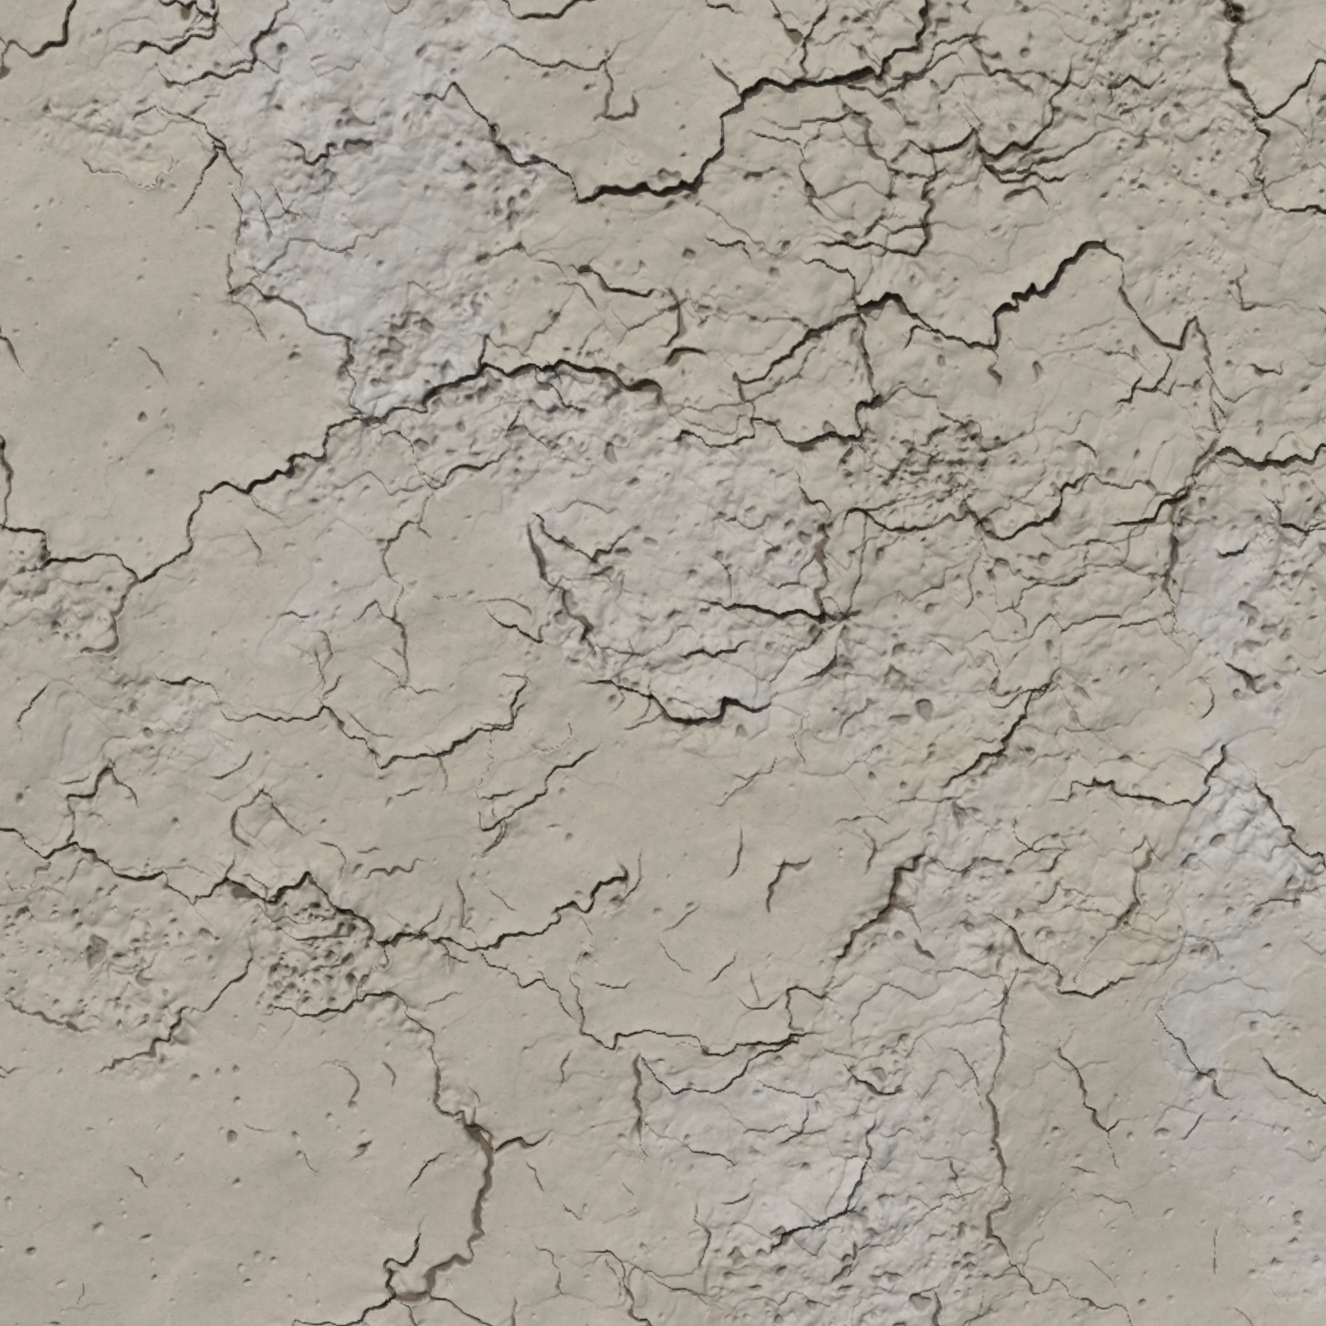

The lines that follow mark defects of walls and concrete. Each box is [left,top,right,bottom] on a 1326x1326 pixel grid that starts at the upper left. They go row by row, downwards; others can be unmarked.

spalling [0,874,217,1033]
crack [0,742,944,1326]
peeling [41,0,1028,1326]
crack [0,0,1326,836]
crack [947,651,1326,1326]
peeling [1144,761,1326,1308]